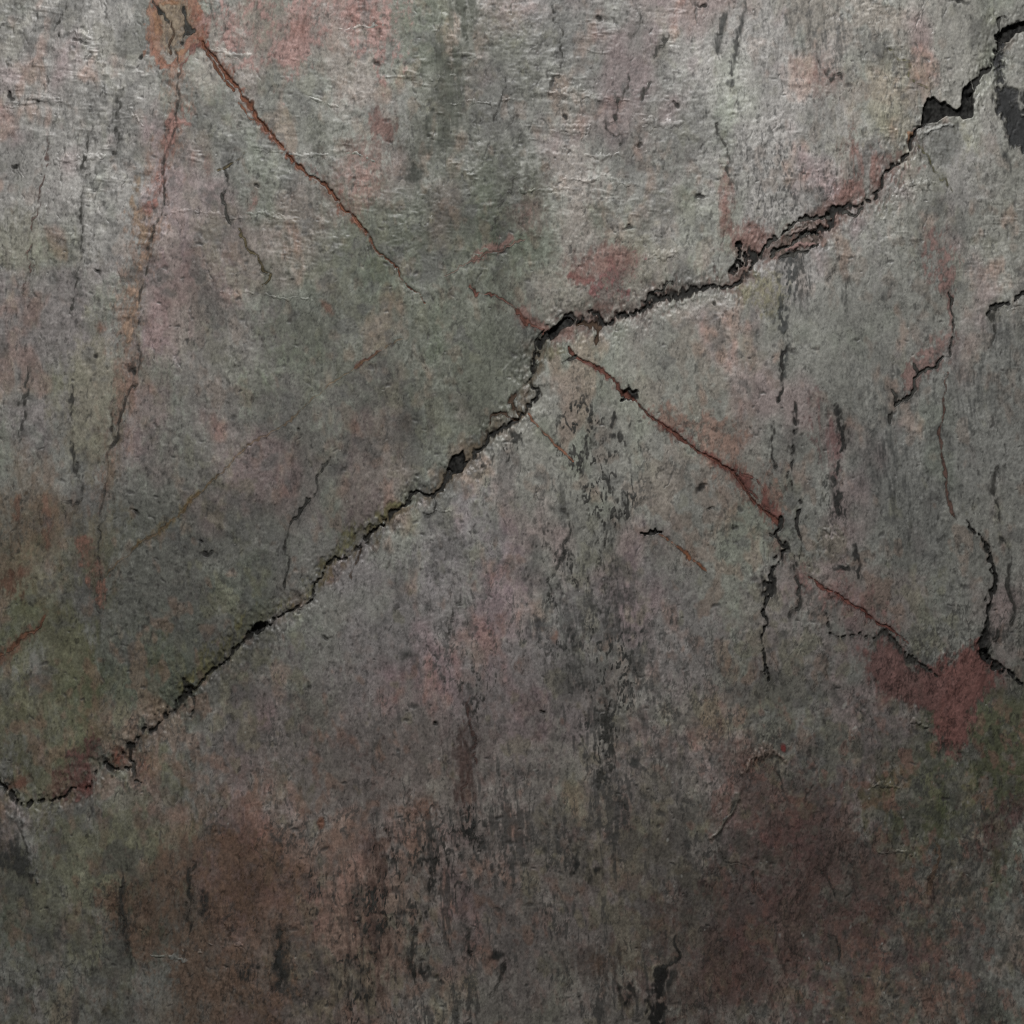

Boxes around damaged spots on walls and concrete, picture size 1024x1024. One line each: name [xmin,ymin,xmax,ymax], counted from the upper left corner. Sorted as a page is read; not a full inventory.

rust [146,0,400,89]
crack [0,0,1024,817]
rust [856,634,999,759]